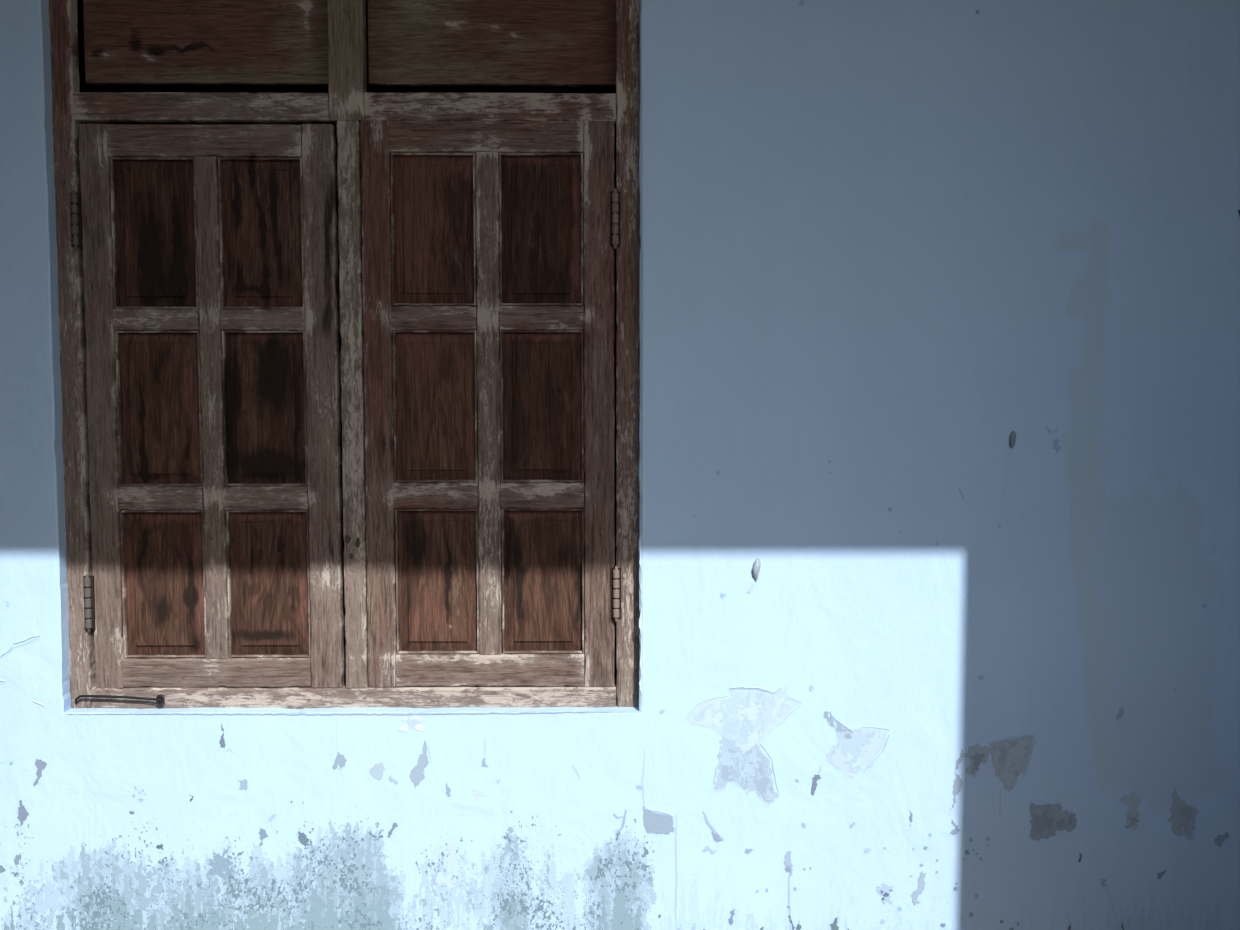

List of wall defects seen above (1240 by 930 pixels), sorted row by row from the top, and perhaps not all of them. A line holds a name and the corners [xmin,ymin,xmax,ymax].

peeling [369,741,429,788]
spalling [694,692,788,806]
peeling [811,774,821,796]
spalling [823,711,889,779]
peeling [949,735,1034,835]
peeling [643,807,674,834]
peeling [1029,802,1077,841]
peeling [1167,789,1199,838]
peeling [0,853,21,877]
leakage [1,802,661,930]